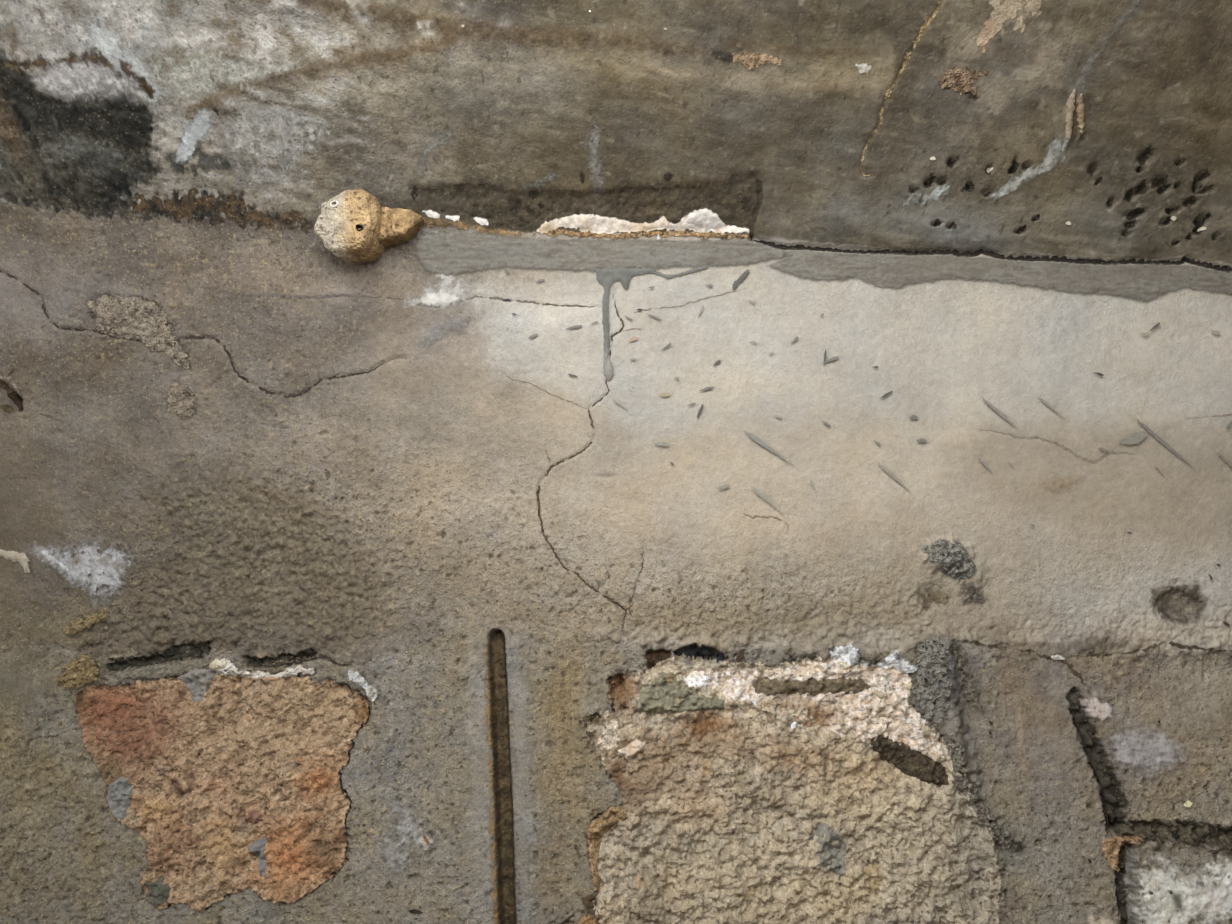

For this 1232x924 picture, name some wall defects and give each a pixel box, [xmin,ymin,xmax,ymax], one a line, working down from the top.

water stain [0,0,330,233]
water stain [410,124,758,230]
peeling [537,208,751,241]
crack [749,176,1232,273]
crack [0,270,143,343]
crack [0,369,60,421]
crack [175,335,399,398]
crack [224,287,748,629]
spalling [75,668,369,913]
spalling [564,653,1004,924]
water stain [1088,916,1118,924]
water stain [1132,854,1232,924]